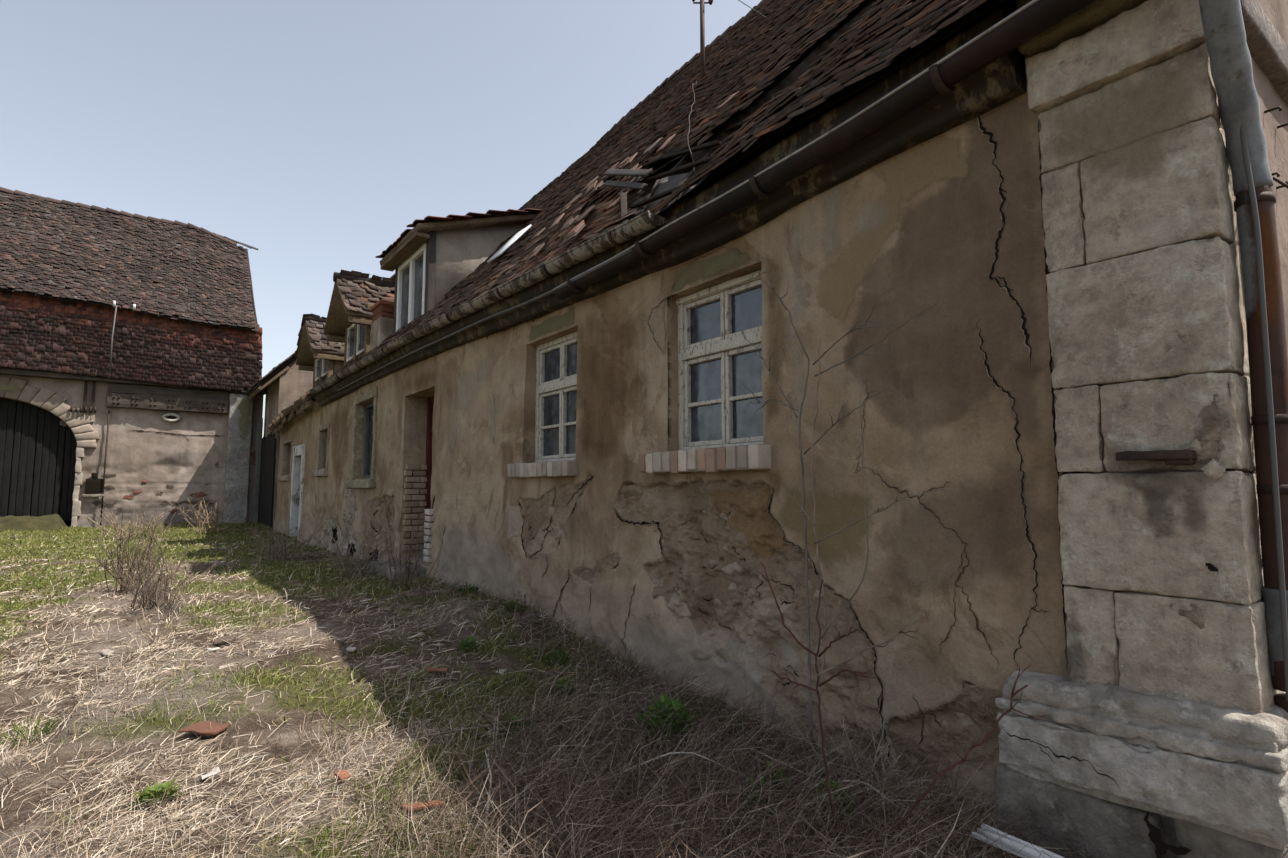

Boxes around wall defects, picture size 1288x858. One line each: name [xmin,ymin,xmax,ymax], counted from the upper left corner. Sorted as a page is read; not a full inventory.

leakage [818,138,968,320]
rust [1248,213,1279,330]
crack [855,116,1069,675]
flaking render [317,488,395,561]
flaking render [519,476,594,559]
flaking render [614,480,1003,812]